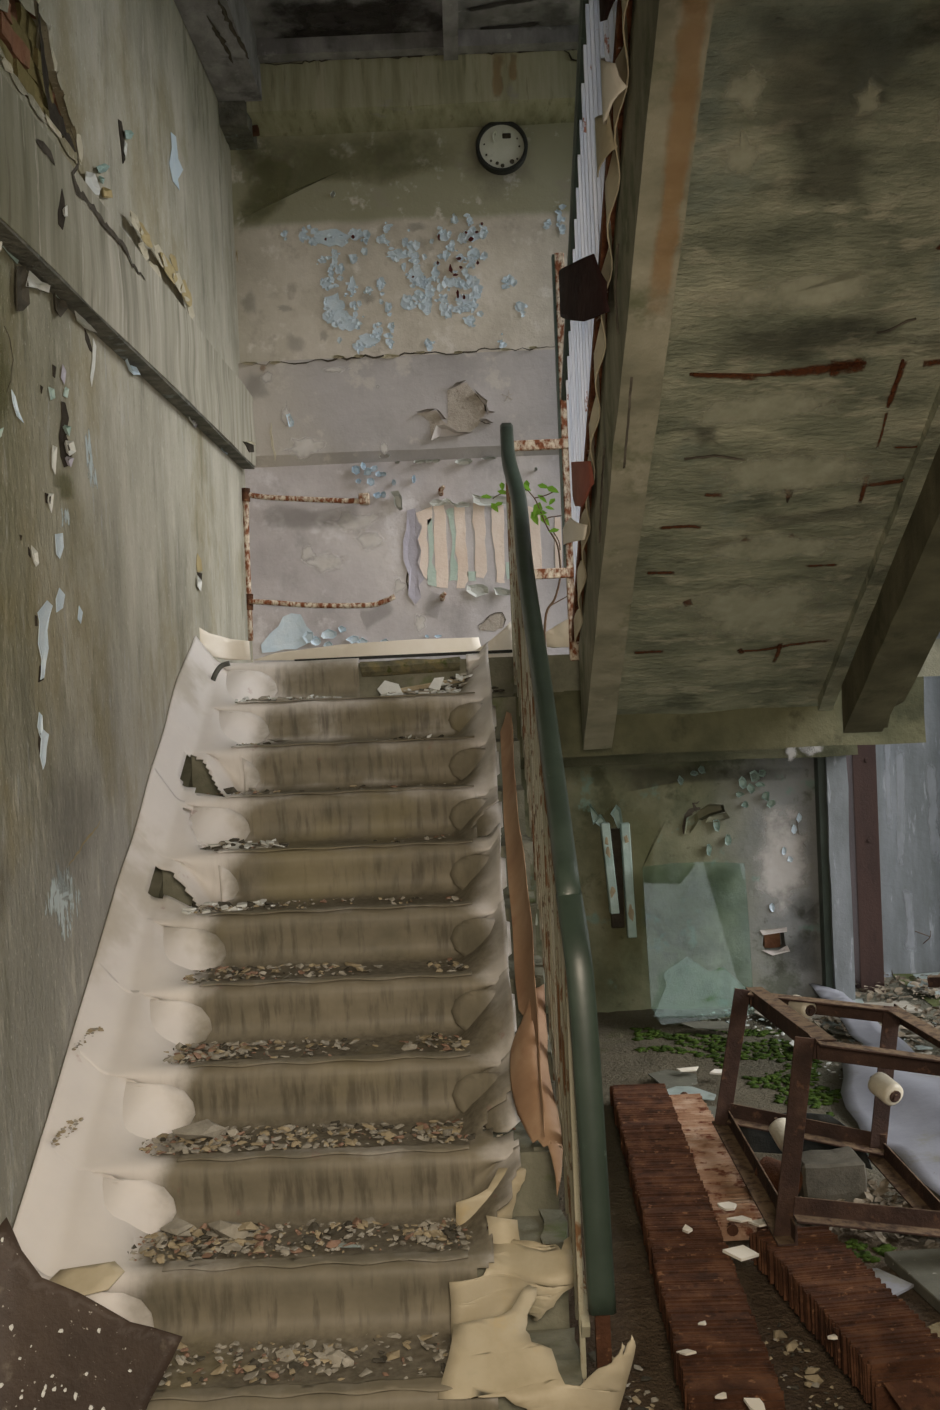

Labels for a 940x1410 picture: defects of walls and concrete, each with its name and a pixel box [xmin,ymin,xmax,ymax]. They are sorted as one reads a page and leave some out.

water stain [271,0,441,39]
flaking render [0,0,134,198]
water stain [858,85,878,113]
peeling [130,210,195,319]
peeling [280,213,488,355]
rust [692,359,865,380]
flaking render [417,380,493,440]
rust [858,476,904,503]
peeling [352,453,506,604]
peeling [35,588,83,682]
rust [737,640,827,662]
peeling [37,712,49,769]